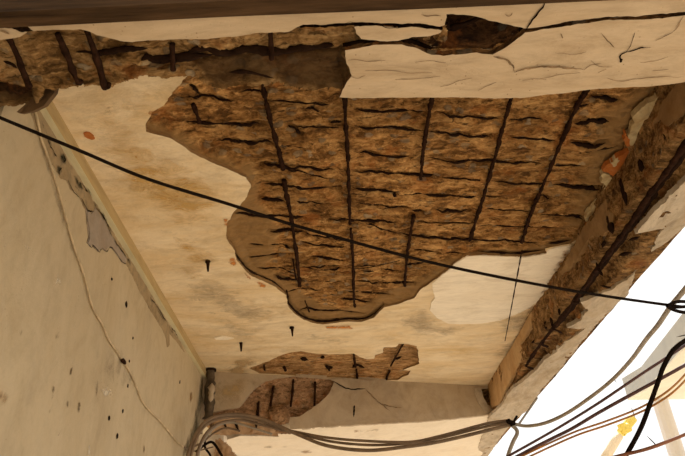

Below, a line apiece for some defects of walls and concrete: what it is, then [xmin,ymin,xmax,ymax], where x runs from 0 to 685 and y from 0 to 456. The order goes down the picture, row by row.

spalling [411,14,519,51]
crack [505,3,545,32]
crack [493,17,683,82]
spalling [0,25,658,351]
spalling [525,139,685,370]
spalling [209,344,419,456]
crack [335,382,401,417]